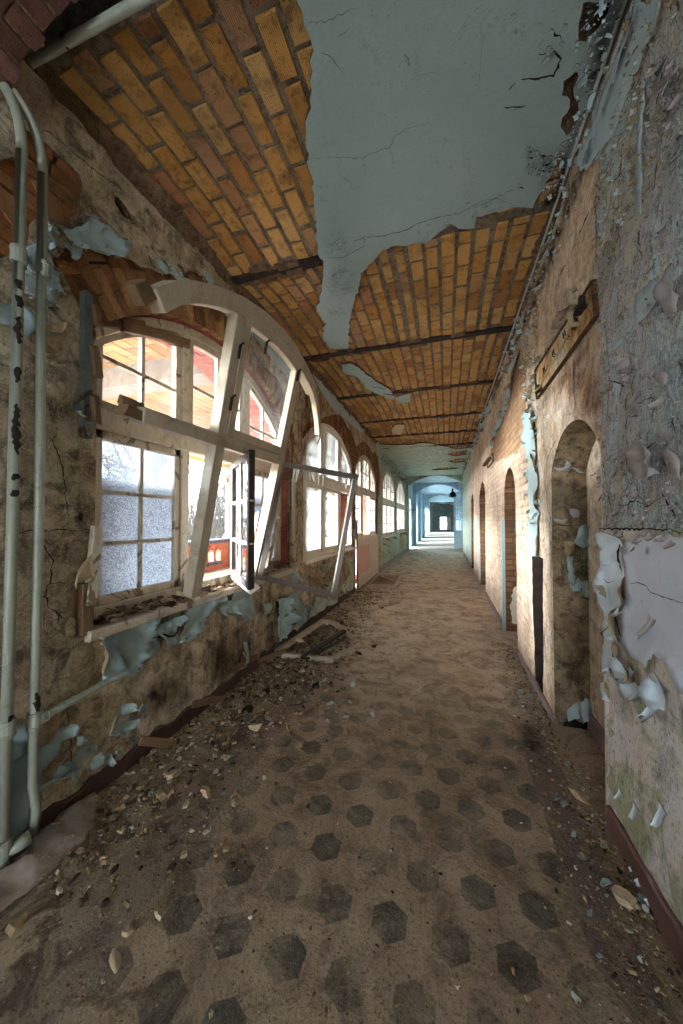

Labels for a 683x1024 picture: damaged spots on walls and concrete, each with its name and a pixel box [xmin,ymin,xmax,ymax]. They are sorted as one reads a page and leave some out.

crack [505,32,562,110]
peeling [24,212,132,359]
peeling [372,387,410,404]
peeling [464,0,683,730]
crack [1,439,90,674]
peeling [99,530,359,680]
peeling [10,703,147,840]
peeling [606,766,640,823]
peeling [650,801,667,832]